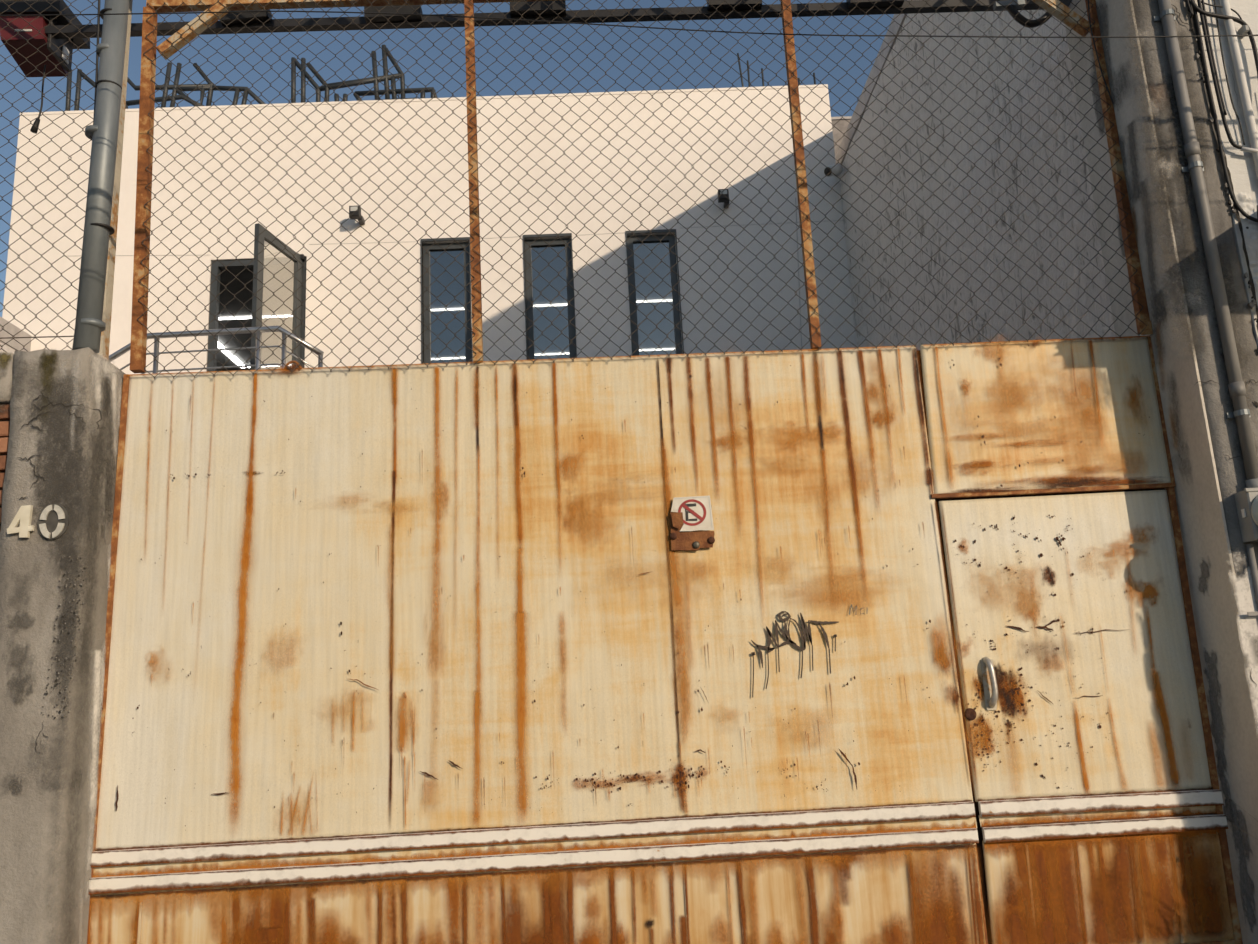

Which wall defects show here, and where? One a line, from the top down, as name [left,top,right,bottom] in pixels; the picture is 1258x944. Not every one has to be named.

water stain [1127,0,1205,354]
water stain [10,646,32,702]
water stain [36,355,121,941]
corrosion [88,335,1228,944]